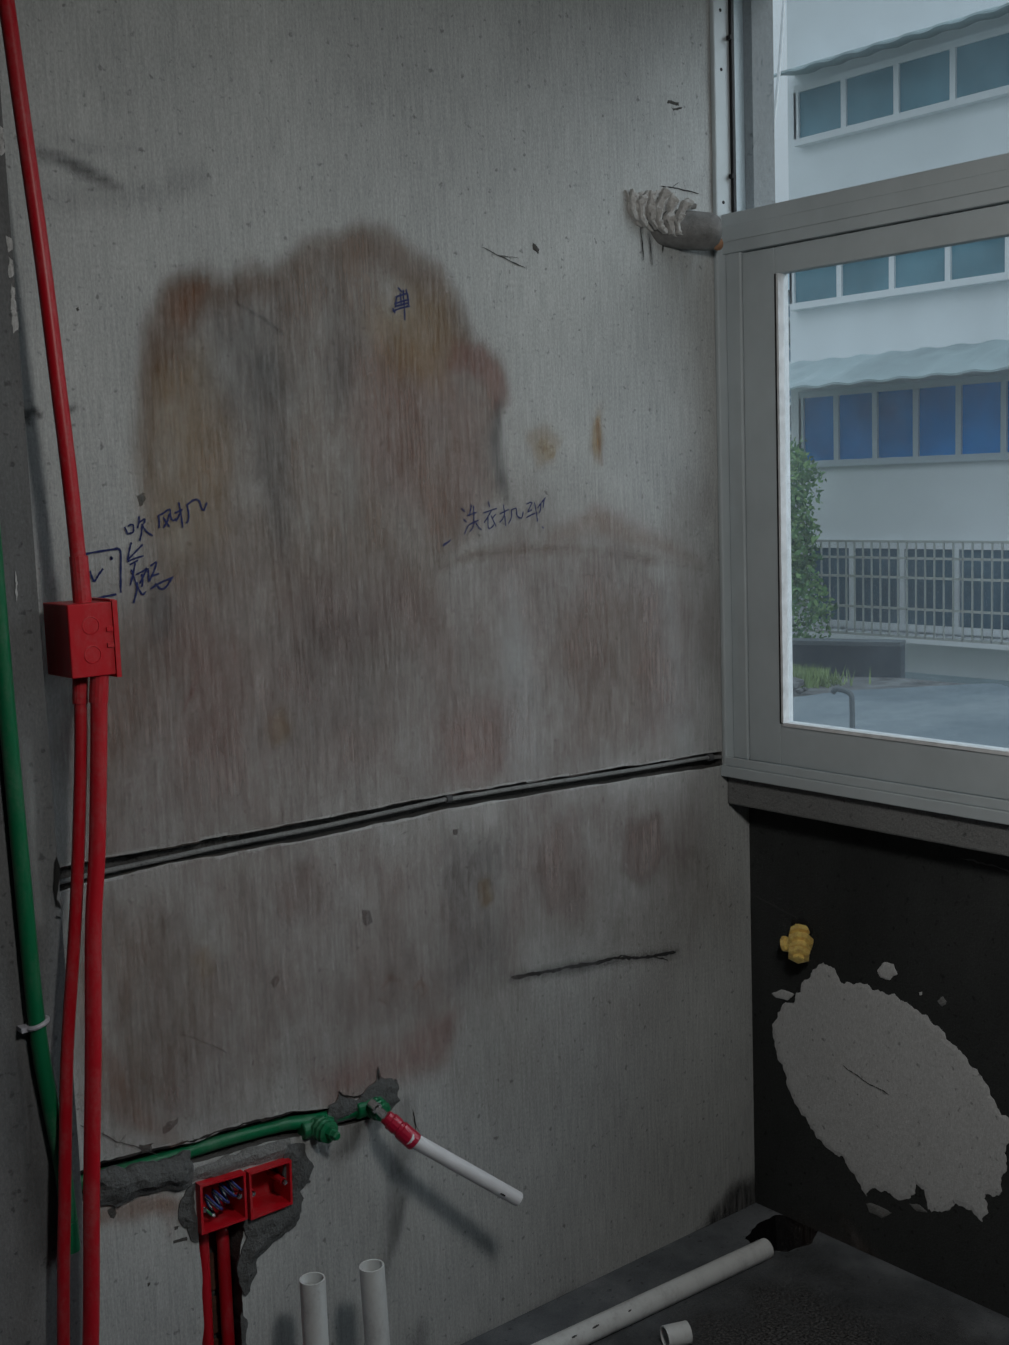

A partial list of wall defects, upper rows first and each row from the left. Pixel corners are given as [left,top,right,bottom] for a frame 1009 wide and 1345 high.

water stain [156,230,532,772]
crack [511,951,676,979]
peeling [772,962,1009,1222]